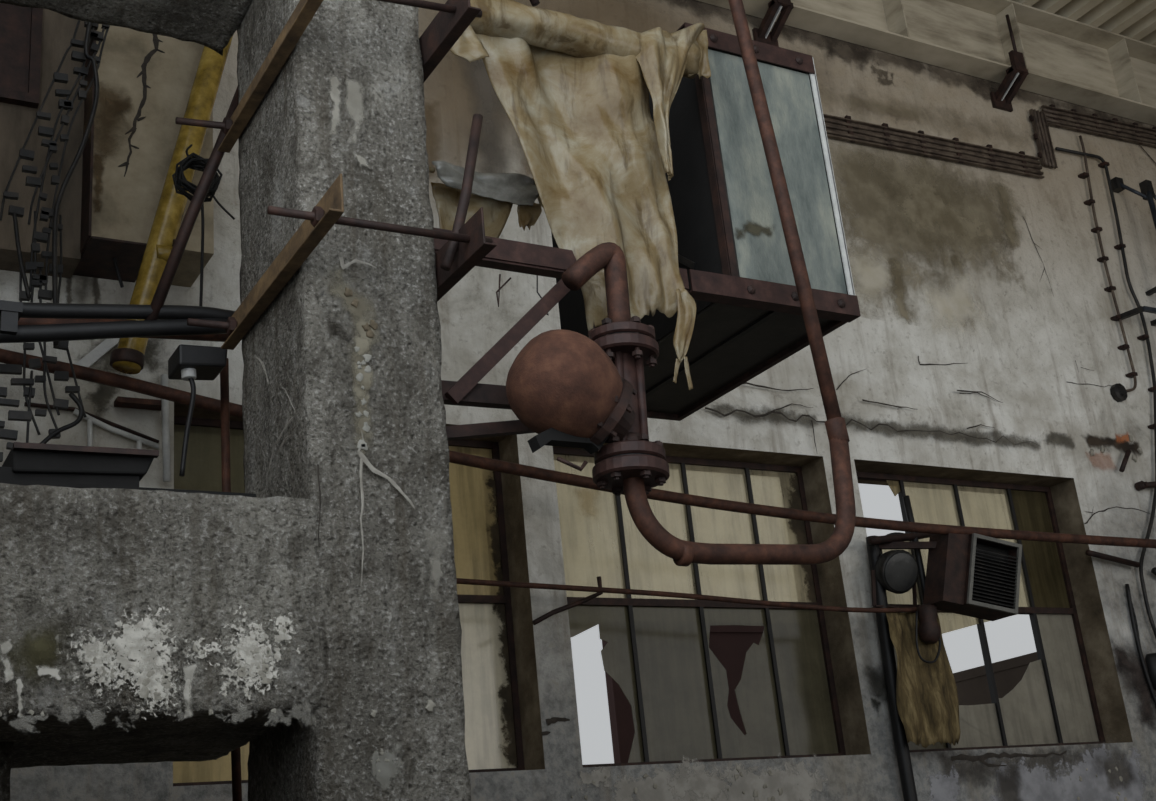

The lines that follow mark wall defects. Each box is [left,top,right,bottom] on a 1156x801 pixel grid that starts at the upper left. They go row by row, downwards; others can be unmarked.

crack [118,34,165,177]
damp [835,148,1018,329]
crack [918,356,964,365]
crack [705,392,1075,451]
peeling [50,602,303,720]